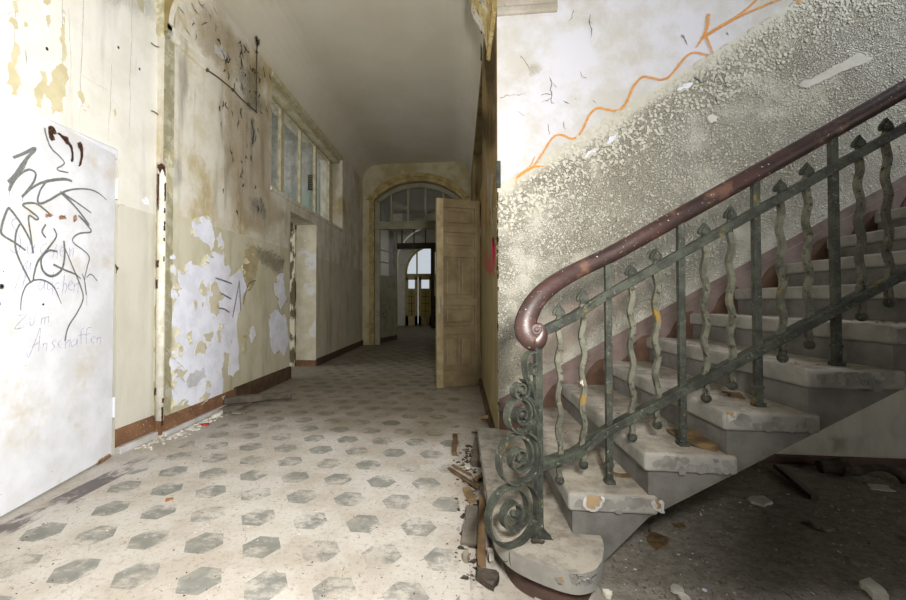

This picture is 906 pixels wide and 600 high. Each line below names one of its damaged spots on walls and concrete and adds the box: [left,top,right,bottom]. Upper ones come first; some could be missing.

peeling [8,0,28,29]
peeling [4,40,23,96]
peeling [34,0,69,117]
crack [502,80,595,134]
peeling [487,0,906,392]
peeling [169,215,259,410]
peeling [269,273,289,356]